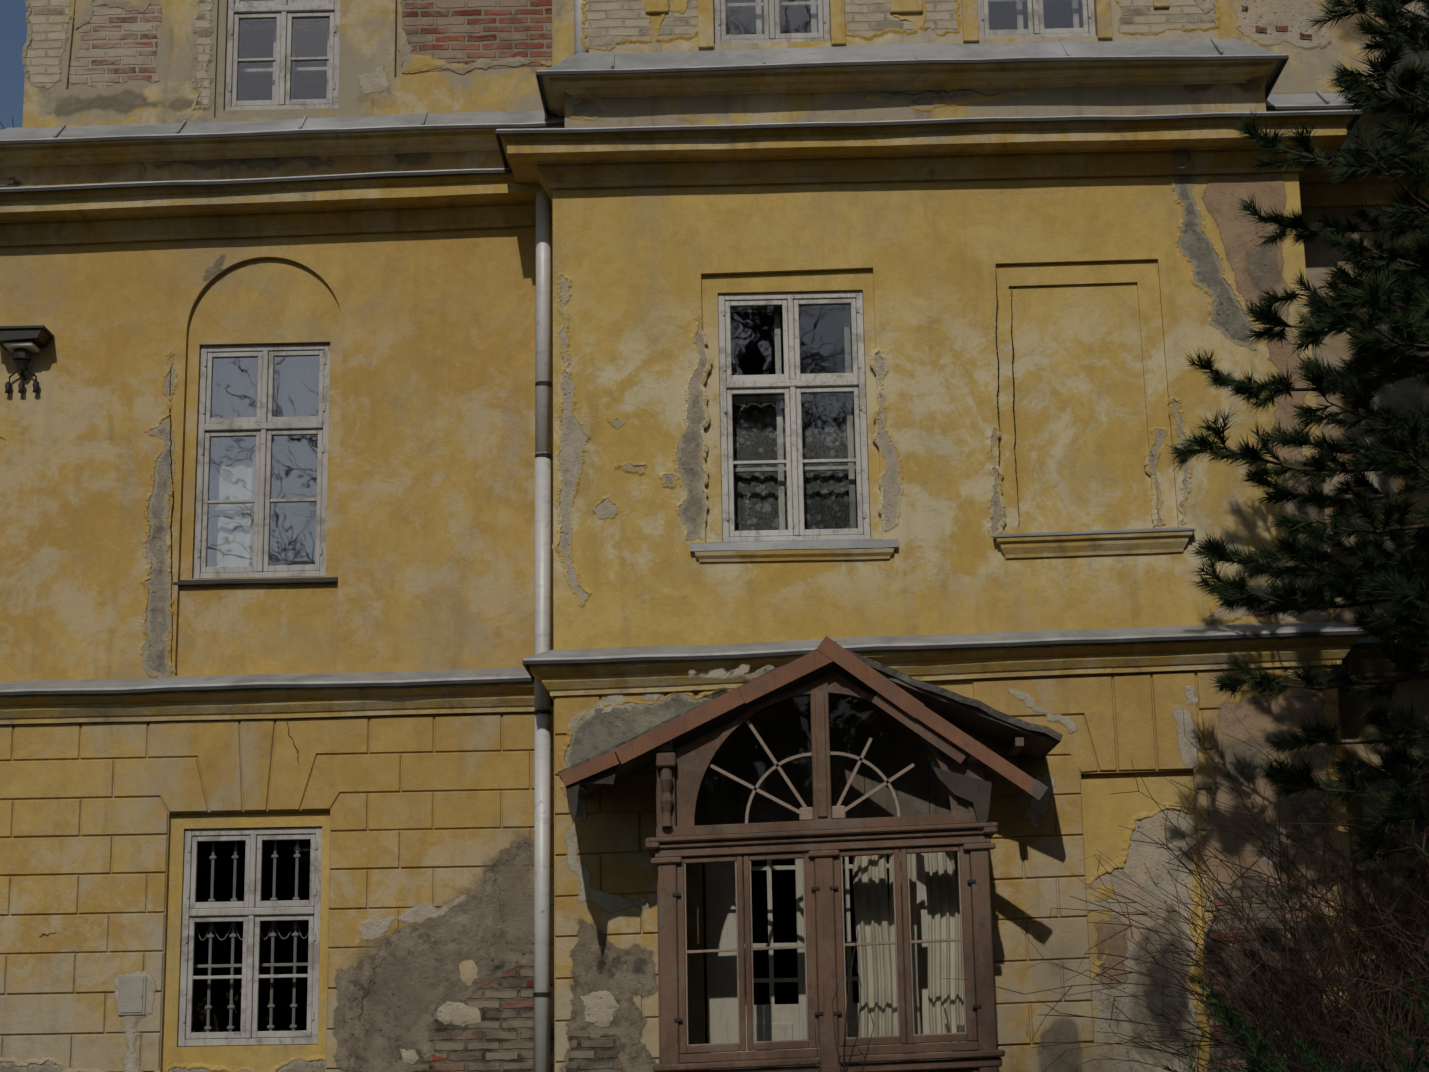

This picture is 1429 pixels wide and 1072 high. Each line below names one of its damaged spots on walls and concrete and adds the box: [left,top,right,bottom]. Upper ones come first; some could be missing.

peeling [22,0,162,91]
peeling [356,30,552,94]
peeling [580,0,698,52]
peeling [845,0,961,41]
peeling [1115,0,1332,50]
peeling [140,349,179,678]
peeling [552,272,592,608]
peeling [614,314,712,541]
peeling [869,346,905,532]
peeling [1202,173,1314,521]
peeling [154,841,658,1072]
peeling [0,1056,106,1072]